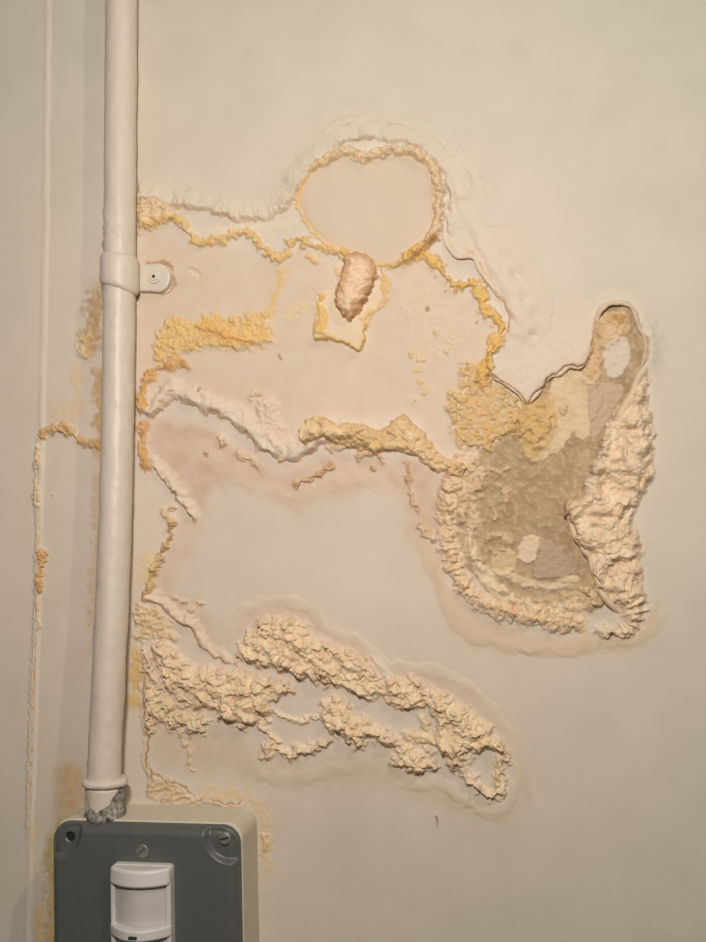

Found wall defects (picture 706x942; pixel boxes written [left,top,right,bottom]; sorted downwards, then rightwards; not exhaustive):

leakage [32,258,103,679]
leakage [50,755,87,811]
peeling [132,454,525,822]
peeling [311,251,409,353]
leakage [134,224,681,845]
peeling [400,286,673,659]